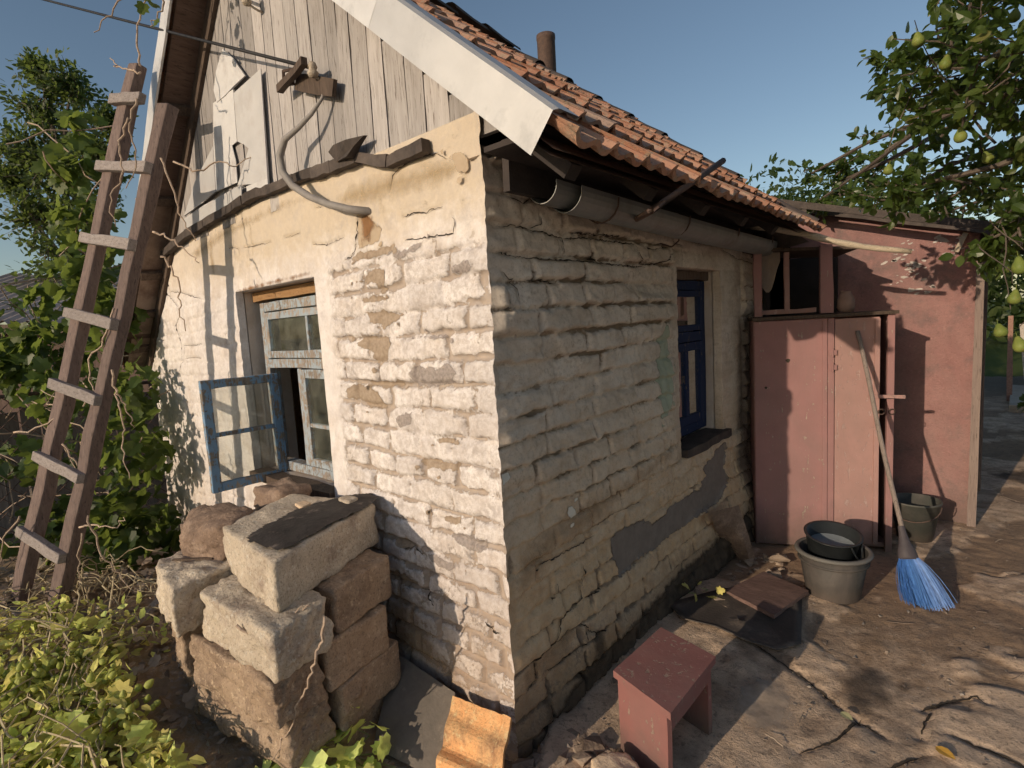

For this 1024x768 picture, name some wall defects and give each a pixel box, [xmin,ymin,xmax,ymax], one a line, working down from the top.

spalling [451,260,472,274]
peeling [881,240,936,295]
spalling [341,214,456,413]
spalling [396,406,419,427]
spalling [415,437,461,479]
spalling [426,509,488,552]
spalling [611,442,729,577]
water stain [544,538,737,732]
crack [754,644,887,754]
crack [891,696,986,768]
crack [950,734,1024,768]